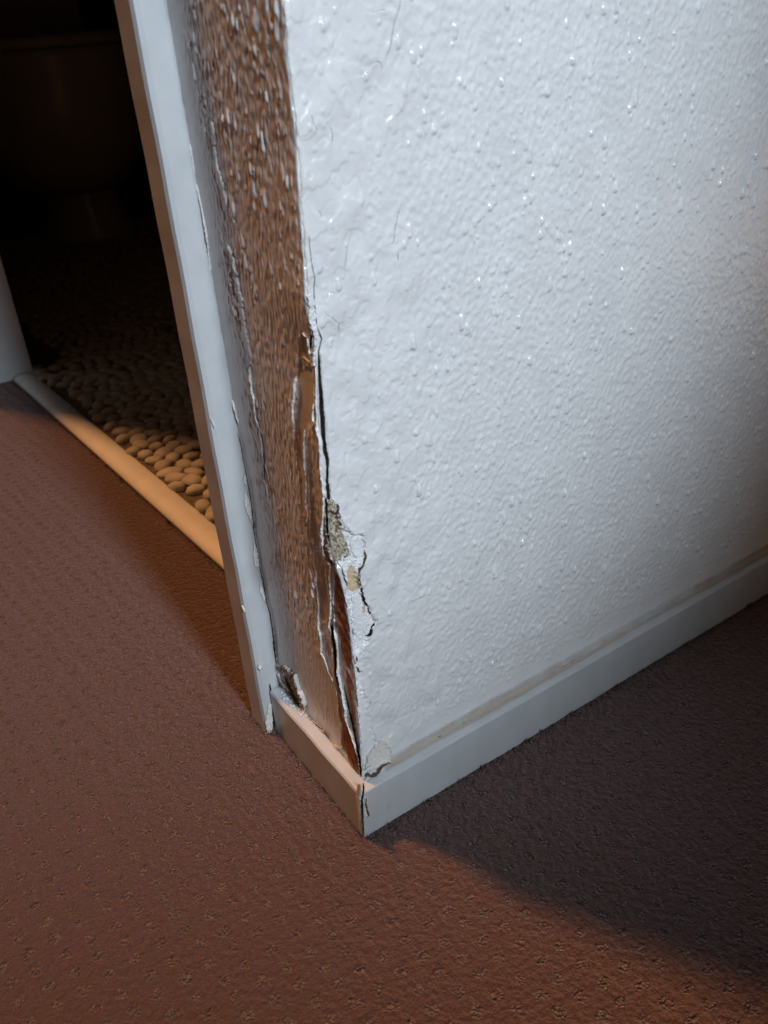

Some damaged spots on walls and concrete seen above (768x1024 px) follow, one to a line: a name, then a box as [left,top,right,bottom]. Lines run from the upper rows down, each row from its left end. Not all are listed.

spalling [265,664,315,733]
spalling [283,1,392,775]
crack [308,239,391,835]